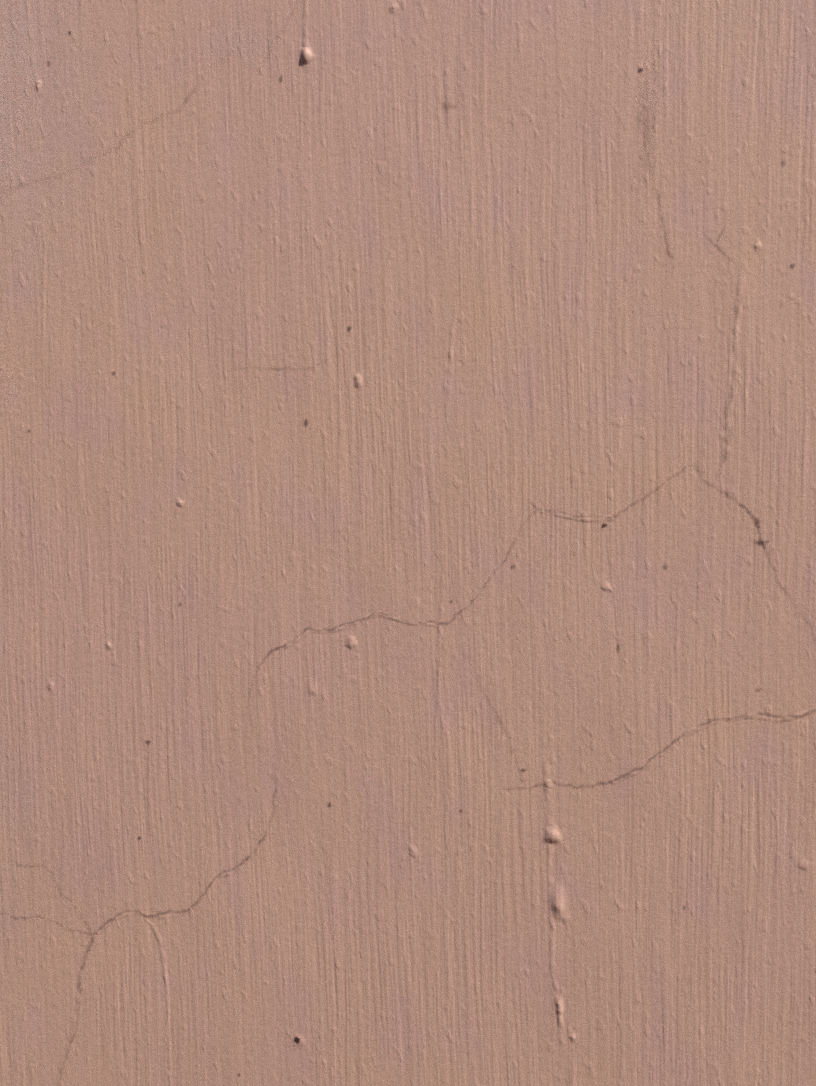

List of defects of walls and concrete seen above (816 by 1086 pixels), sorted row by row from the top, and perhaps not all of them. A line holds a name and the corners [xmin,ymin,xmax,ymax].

crack [541,509,614,523]
crack [276,611,443,651]
crack [611,707,816,785]
crack [55,850,258,1086]